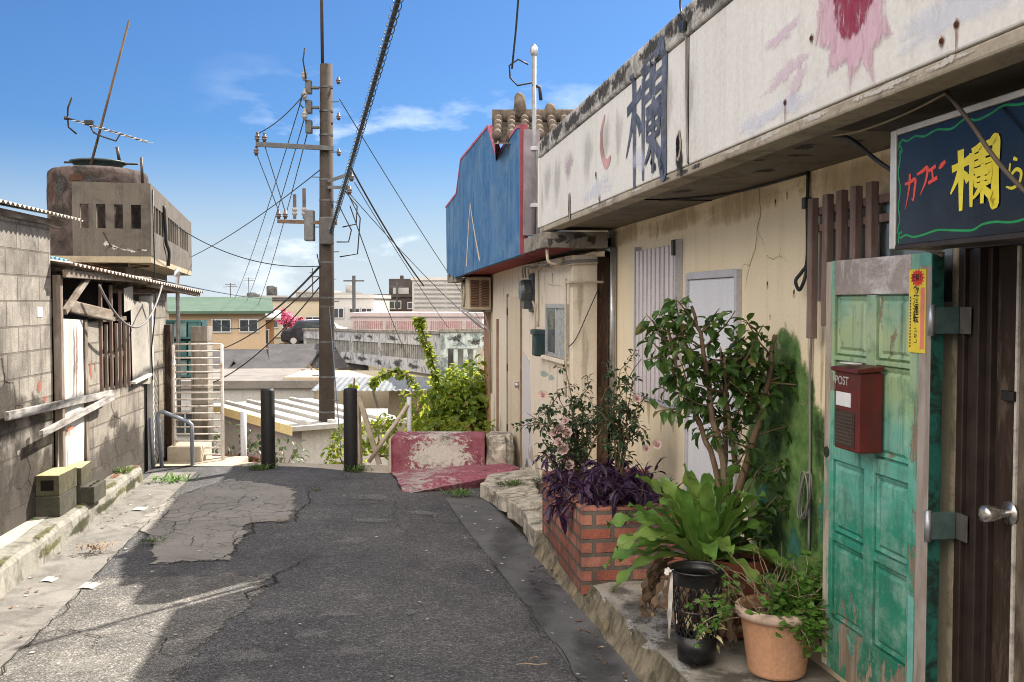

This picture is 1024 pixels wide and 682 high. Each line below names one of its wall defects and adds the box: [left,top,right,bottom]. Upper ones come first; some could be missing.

water stain [540,0,716,150]
rust [939,18,959,51]
rust [46,173,98,208]
crack [743,189,783,287]
peeling [404,352,533,469]
crack [1,486,312,674]
crack [204,556,344,605]